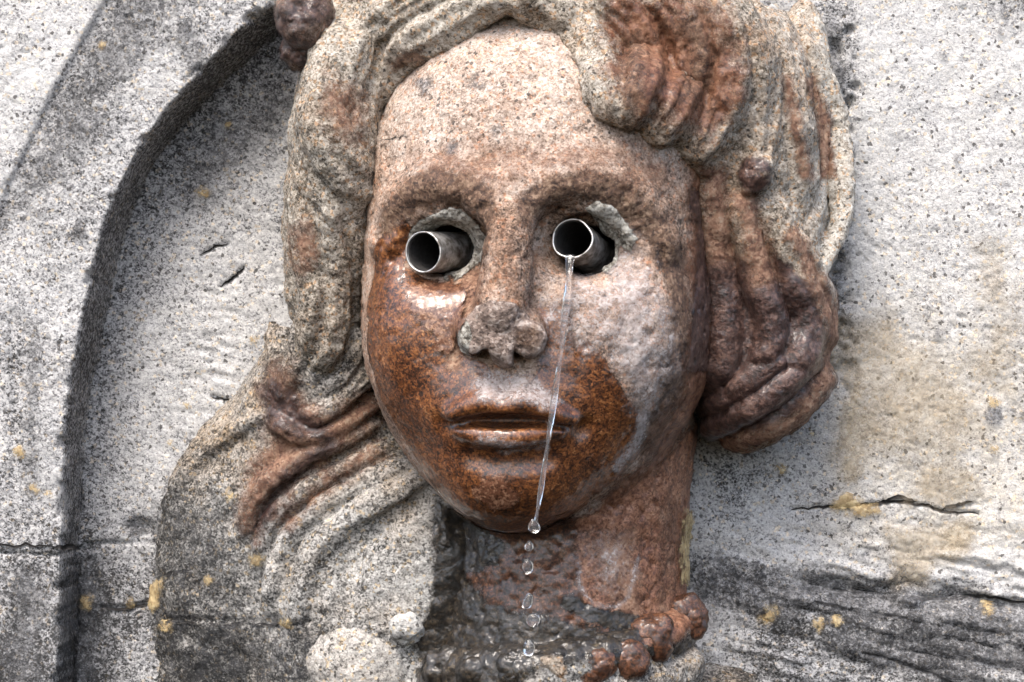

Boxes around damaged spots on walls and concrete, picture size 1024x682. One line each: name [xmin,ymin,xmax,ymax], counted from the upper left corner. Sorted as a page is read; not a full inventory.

water stain [846,369,965,443]
crack [791,494,978,514]
crack [0,542,79,551]